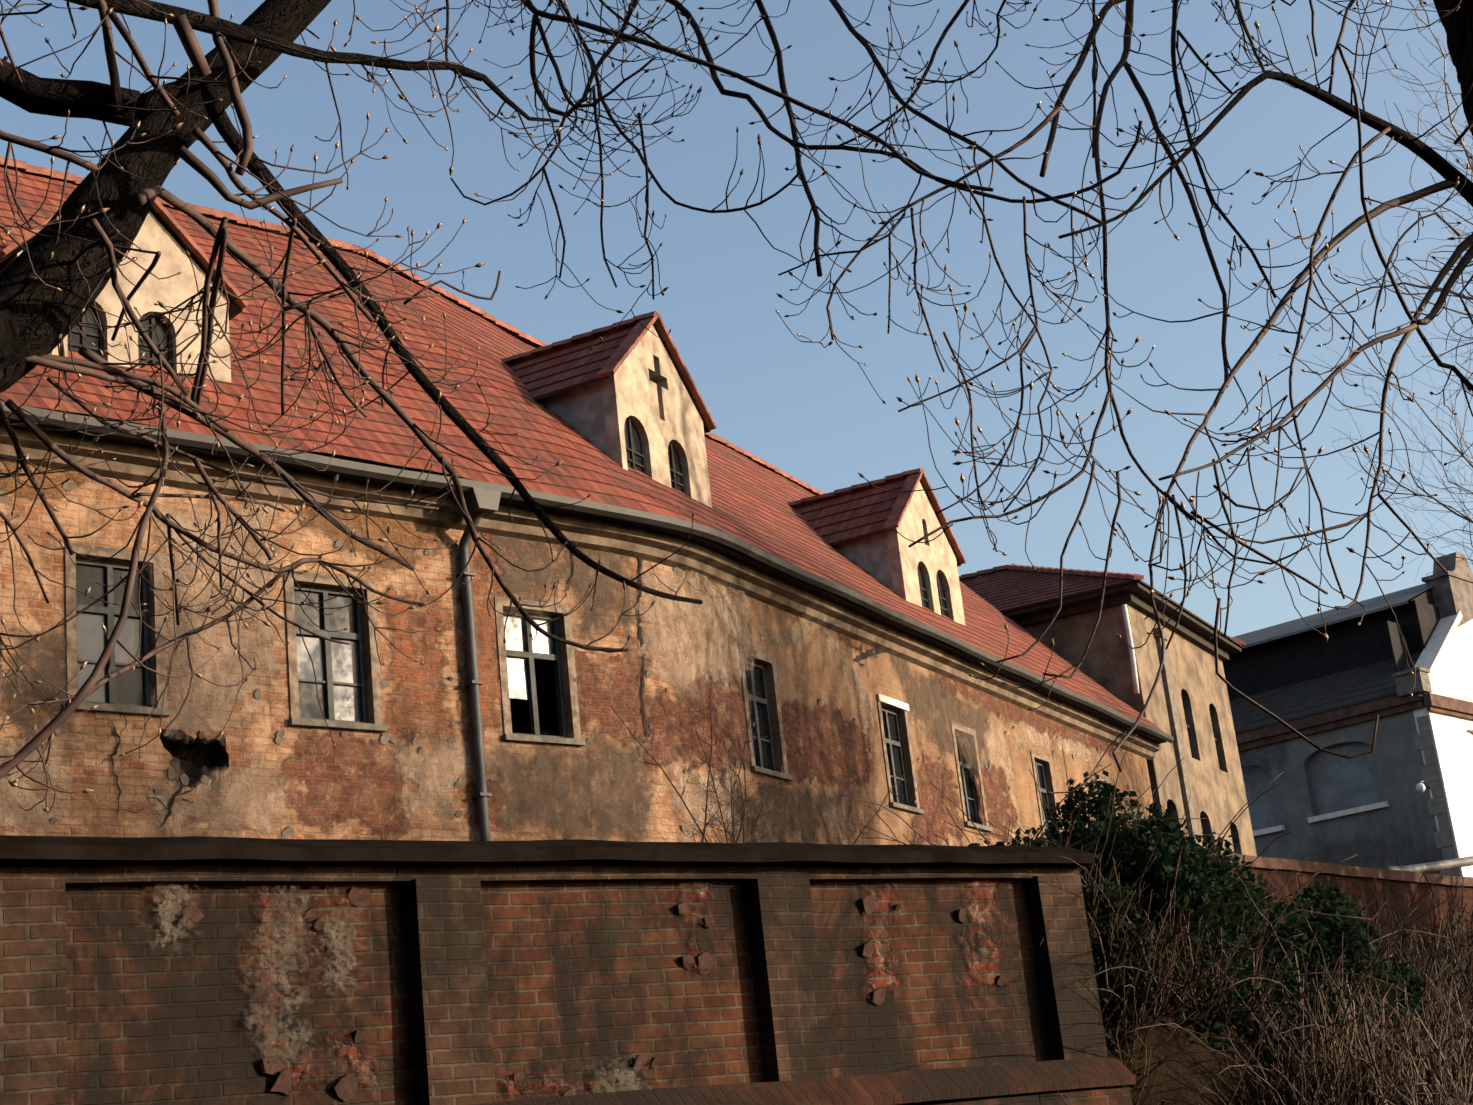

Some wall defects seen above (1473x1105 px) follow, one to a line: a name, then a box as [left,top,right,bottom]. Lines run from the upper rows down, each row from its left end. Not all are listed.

spalling [153,725,232,795]
leakage [251,897,310,1056]